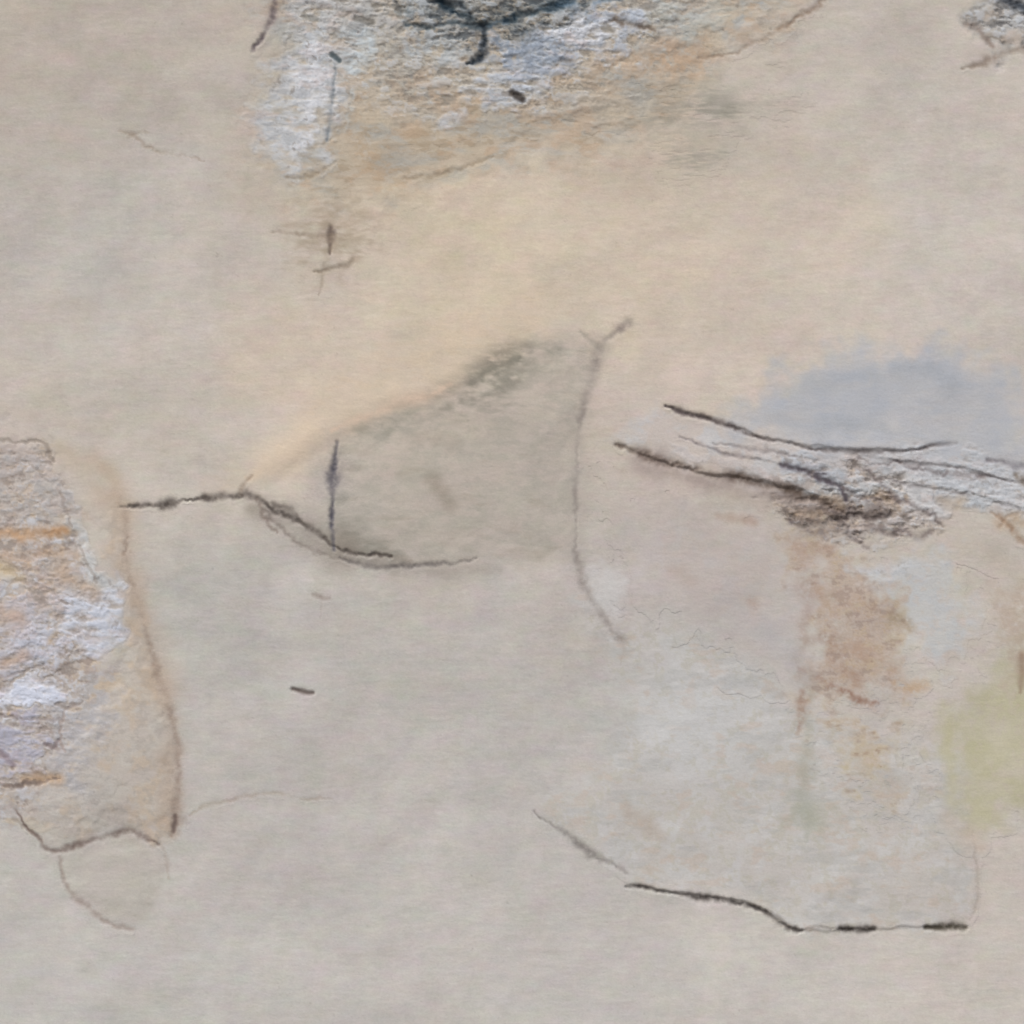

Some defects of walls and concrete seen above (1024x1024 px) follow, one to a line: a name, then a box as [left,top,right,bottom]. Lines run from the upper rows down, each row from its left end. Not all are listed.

flaking render [223,0,840,231]
flaking render [955,0,1024,75]
crack [559,311,1024,666]
flaking render [599,382,1024,555]
water stain [745,324,1024,453]
peeling [0,411,151,848]
crack [9,438,480,938]
rust [778,505,937,834]
crack [530,808,983,943]